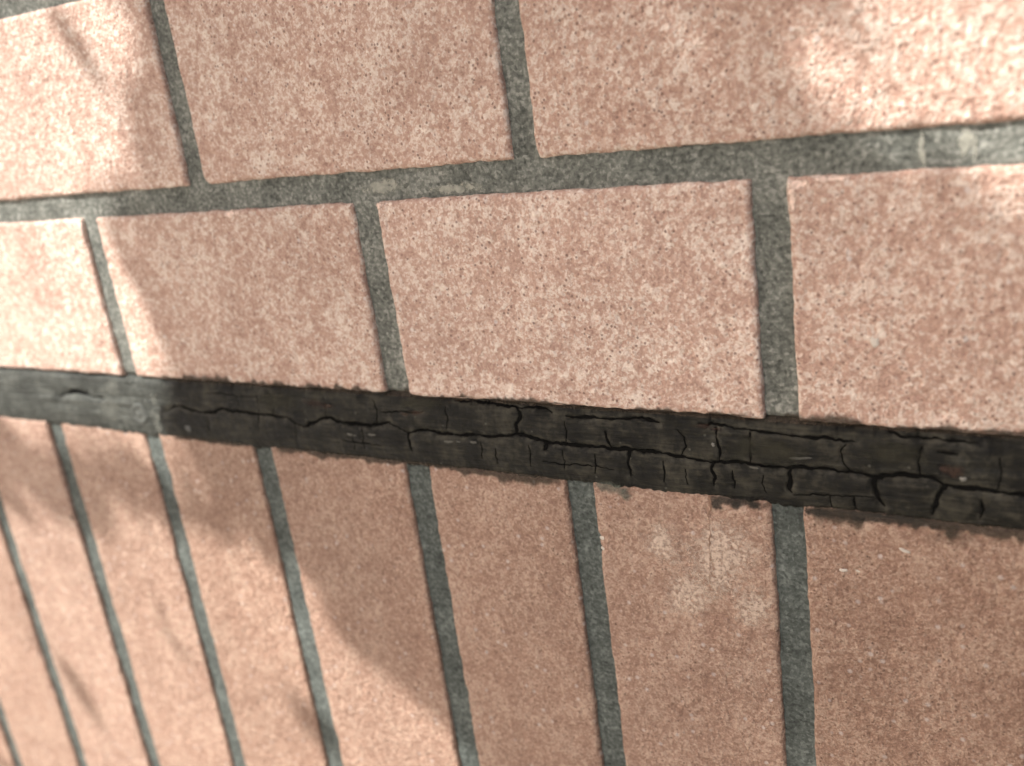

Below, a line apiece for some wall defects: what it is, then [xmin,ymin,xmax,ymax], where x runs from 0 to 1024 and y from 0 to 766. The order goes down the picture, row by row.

crack [168,392,1024,580]